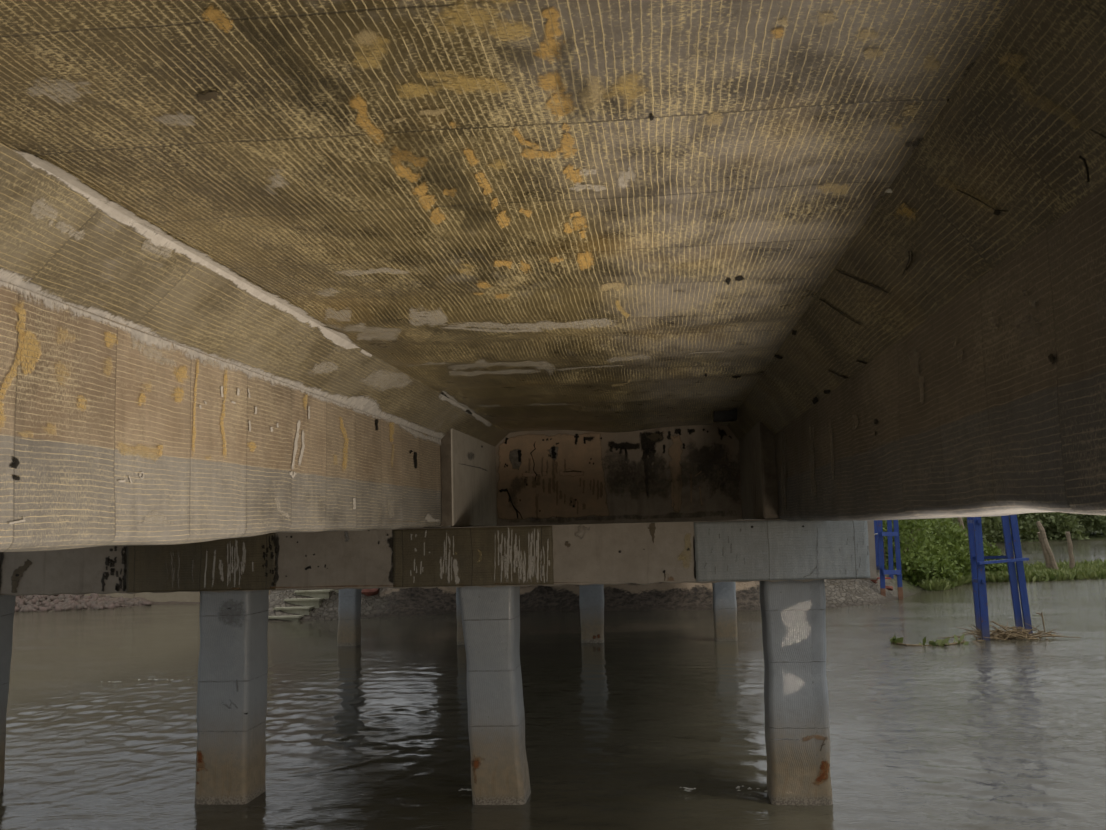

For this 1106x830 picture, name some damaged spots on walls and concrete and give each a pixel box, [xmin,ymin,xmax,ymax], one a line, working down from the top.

damp [608,428,732,496]
rust [816,761,830,782]